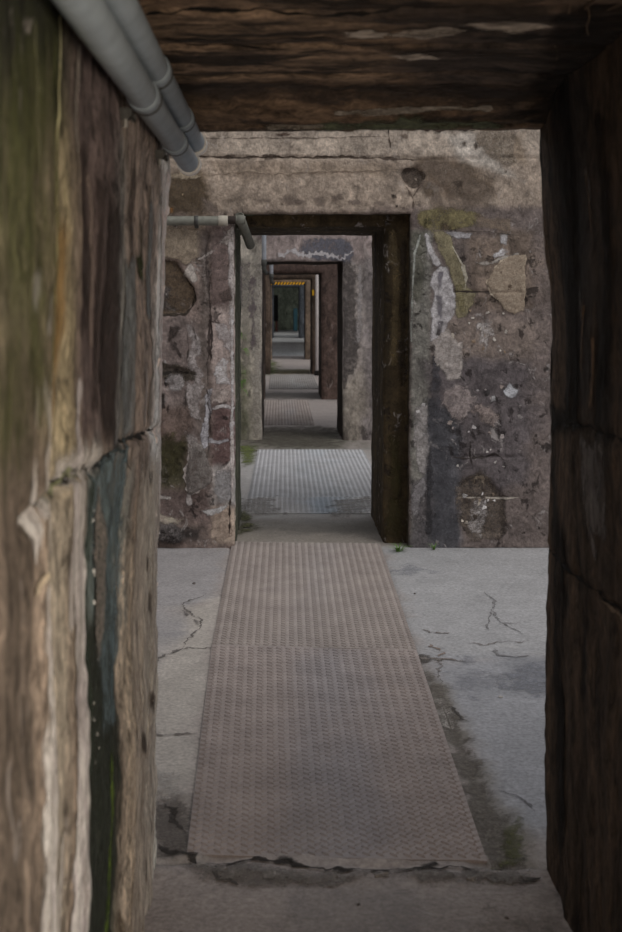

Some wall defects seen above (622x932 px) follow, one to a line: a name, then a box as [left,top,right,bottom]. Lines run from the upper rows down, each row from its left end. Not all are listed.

peeling [210,241,262,349]
peeling [486,254,527,314]
peeling [431,329,504,439]
crack [549,405,622,442]
crack [18,428,153,520]
leakage [19,42,153,932]
peeling [183,441,212,506]
spalling [454,471,507,542]
spalling [131,169,198,932]
crack [158,595,208,661]
crack [419,629,458,682]
crack [471,592,528,657]